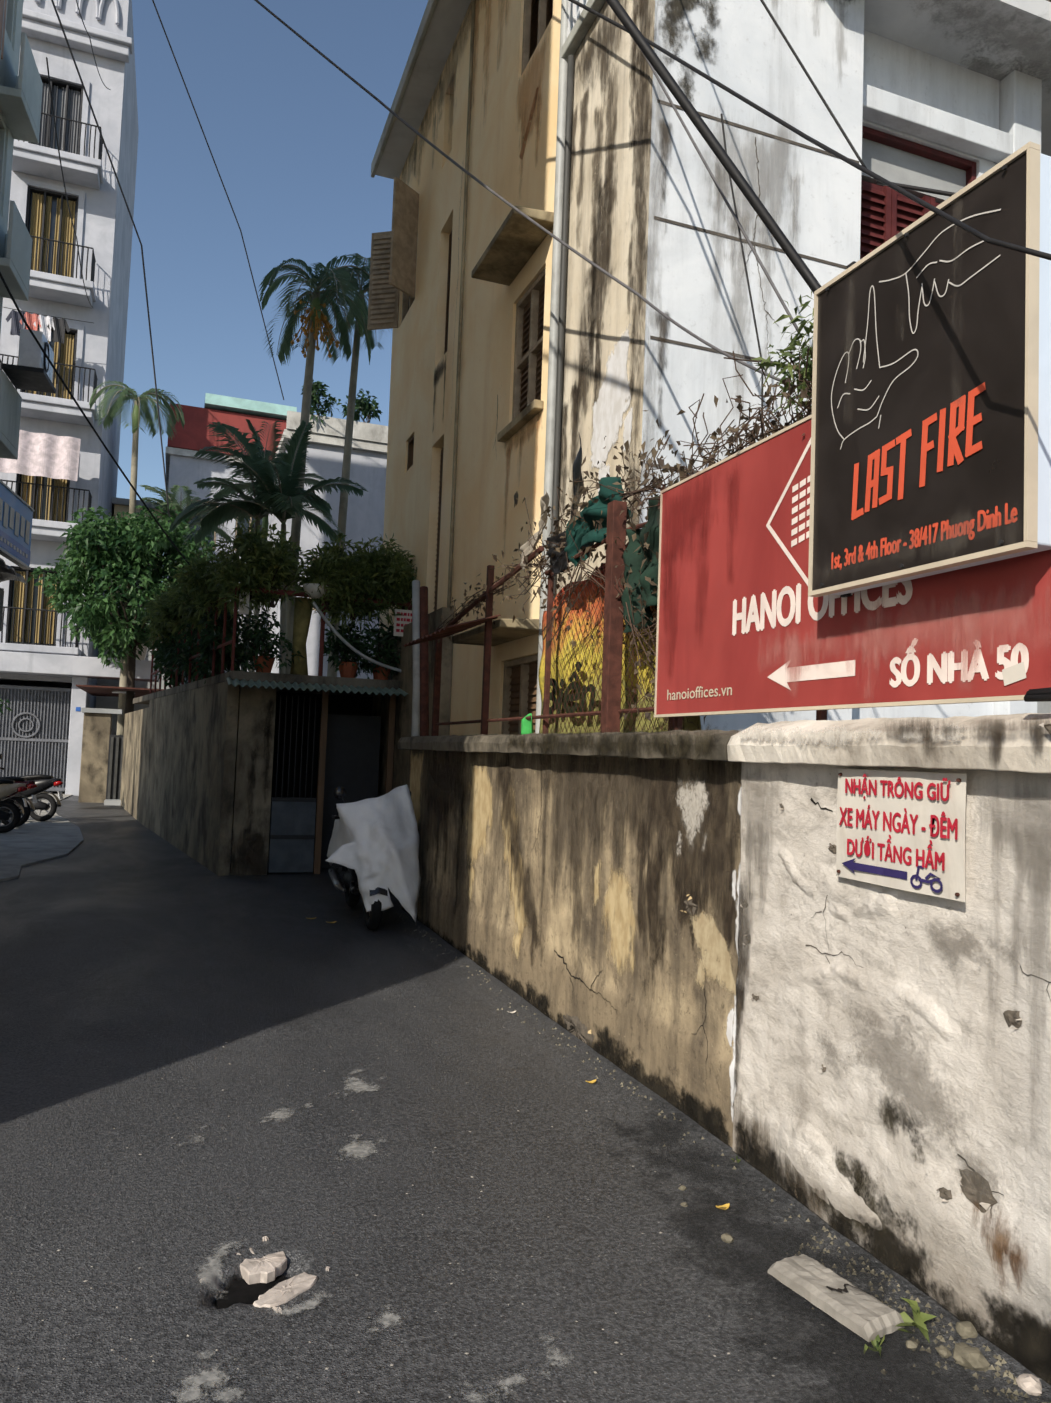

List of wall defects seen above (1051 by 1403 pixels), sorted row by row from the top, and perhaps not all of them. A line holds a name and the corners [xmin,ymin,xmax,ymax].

leakage [571,0,638,303]
leakage [660,121,672,199]
leakage [658,313,669,372]
leakage [562,322,601,506]
leakage [531,754,665,965]
leakage [723,886,734,952]
crack [806,874,863,968]
crack [554,950,616,1010]
leakage [402,906,1051,1385]
spalling [936,1169,998,1213]